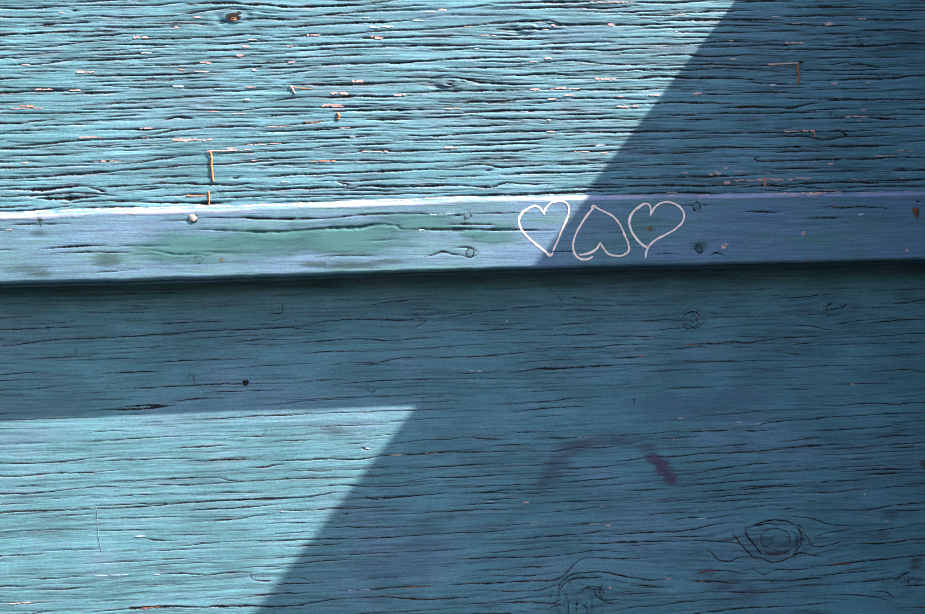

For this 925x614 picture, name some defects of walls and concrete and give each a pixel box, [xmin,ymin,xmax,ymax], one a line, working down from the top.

peeling [708,167,812,195]
peeling [11,194,228,215]
peeling [245,196,480,206]
crack [42,245,154,273]
leakage [645,453,676,485]